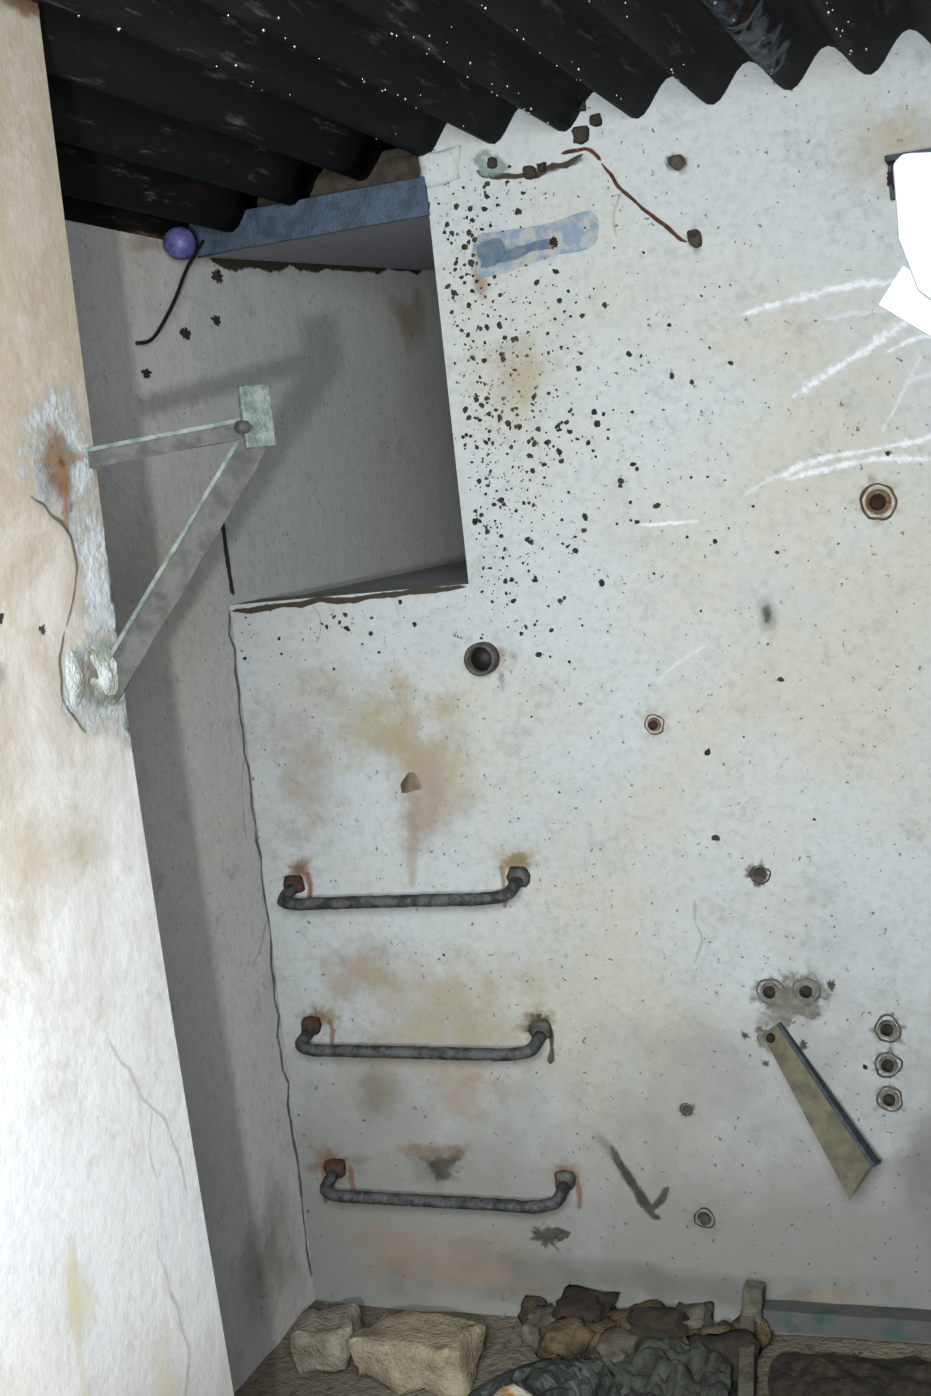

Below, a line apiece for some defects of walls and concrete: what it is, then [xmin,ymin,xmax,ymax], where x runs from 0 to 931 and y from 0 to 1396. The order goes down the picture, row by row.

leakage [437,165,661,670]
corrosion [40,441,83,527]
leakage [321,610,381,654]
corrosion [528,1014,554,1064]